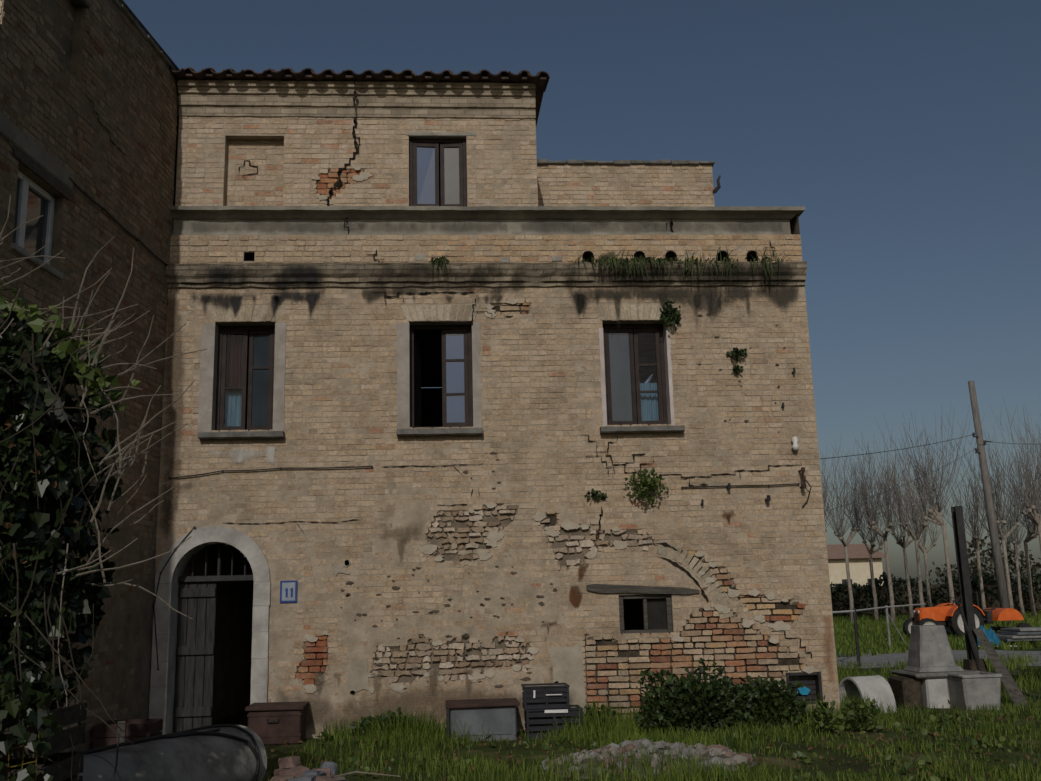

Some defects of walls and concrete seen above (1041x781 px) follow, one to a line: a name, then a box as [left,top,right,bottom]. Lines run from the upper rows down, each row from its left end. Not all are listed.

spalling [312,167,373,205]
crack [326,80,360,233]
damp [193,265,245,315]
damp [271,265,320,314]
crack [371,291,492,325]
spalling [420,502,518,574]
spalling [533,512,660,572]
spalling [297,631,328,693]
spalling [368,633,539,693]
spalling [585,550,814,722]